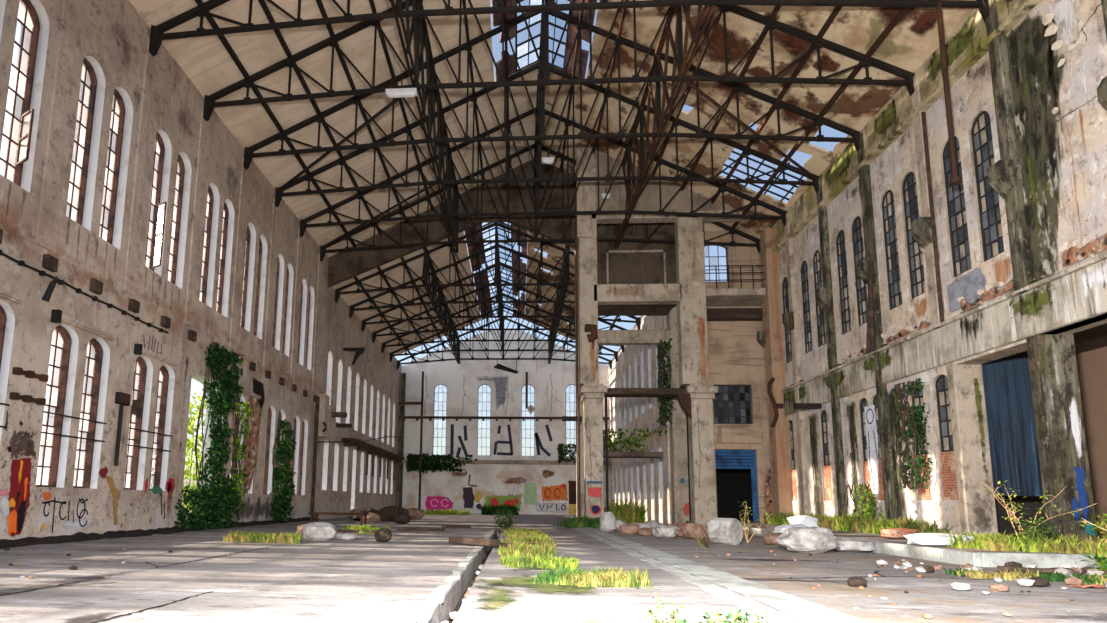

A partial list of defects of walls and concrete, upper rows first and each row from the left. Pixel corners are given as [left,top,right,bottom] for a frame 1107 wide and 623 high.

leakage [1008,31,1062,263]
flaking render [1058,233,1107,267]
flaking render [957,280,1014,312]
leakage [1010,283,1050,316]
leakage [1066,262,1107,299]
crack [90,591,213,623]